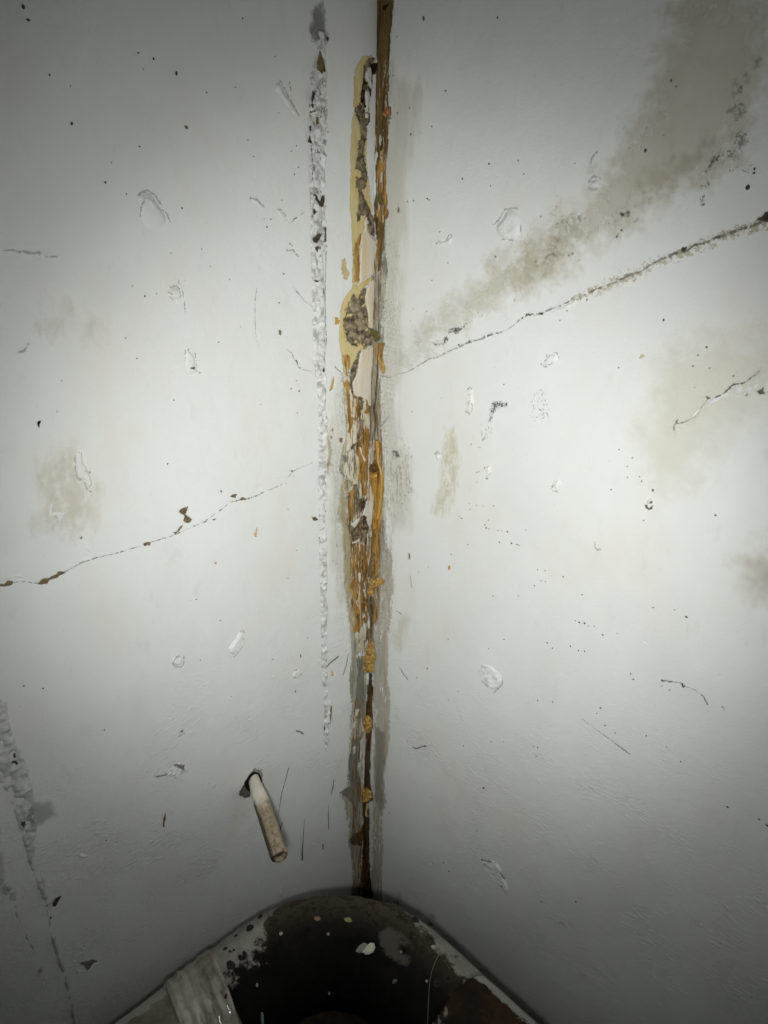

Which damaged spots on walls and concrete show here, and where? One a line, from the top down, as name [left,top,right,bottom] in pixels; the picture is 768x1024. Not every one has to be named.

crack [0,465,304,587]
peeling [312,55,380,377]
spalling [351,484,371,547]
rust [338,0,394,899]
crack [329,212,768,506]
damp [700,58,759,206]